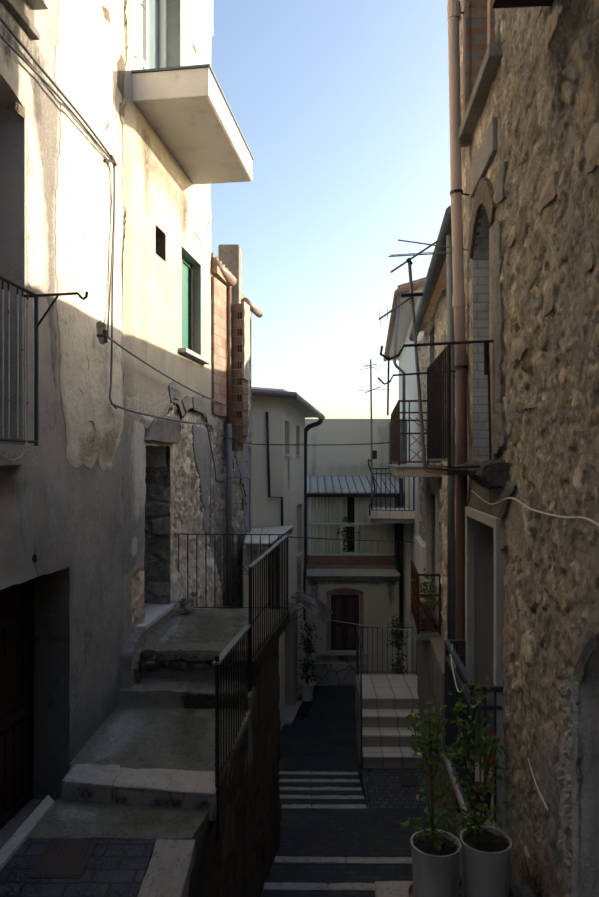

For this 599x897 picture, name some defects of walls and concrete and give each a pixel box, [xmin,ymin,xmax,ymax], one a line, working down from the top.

flaking render [13,0,214,574]
crack [104,0,147,66]